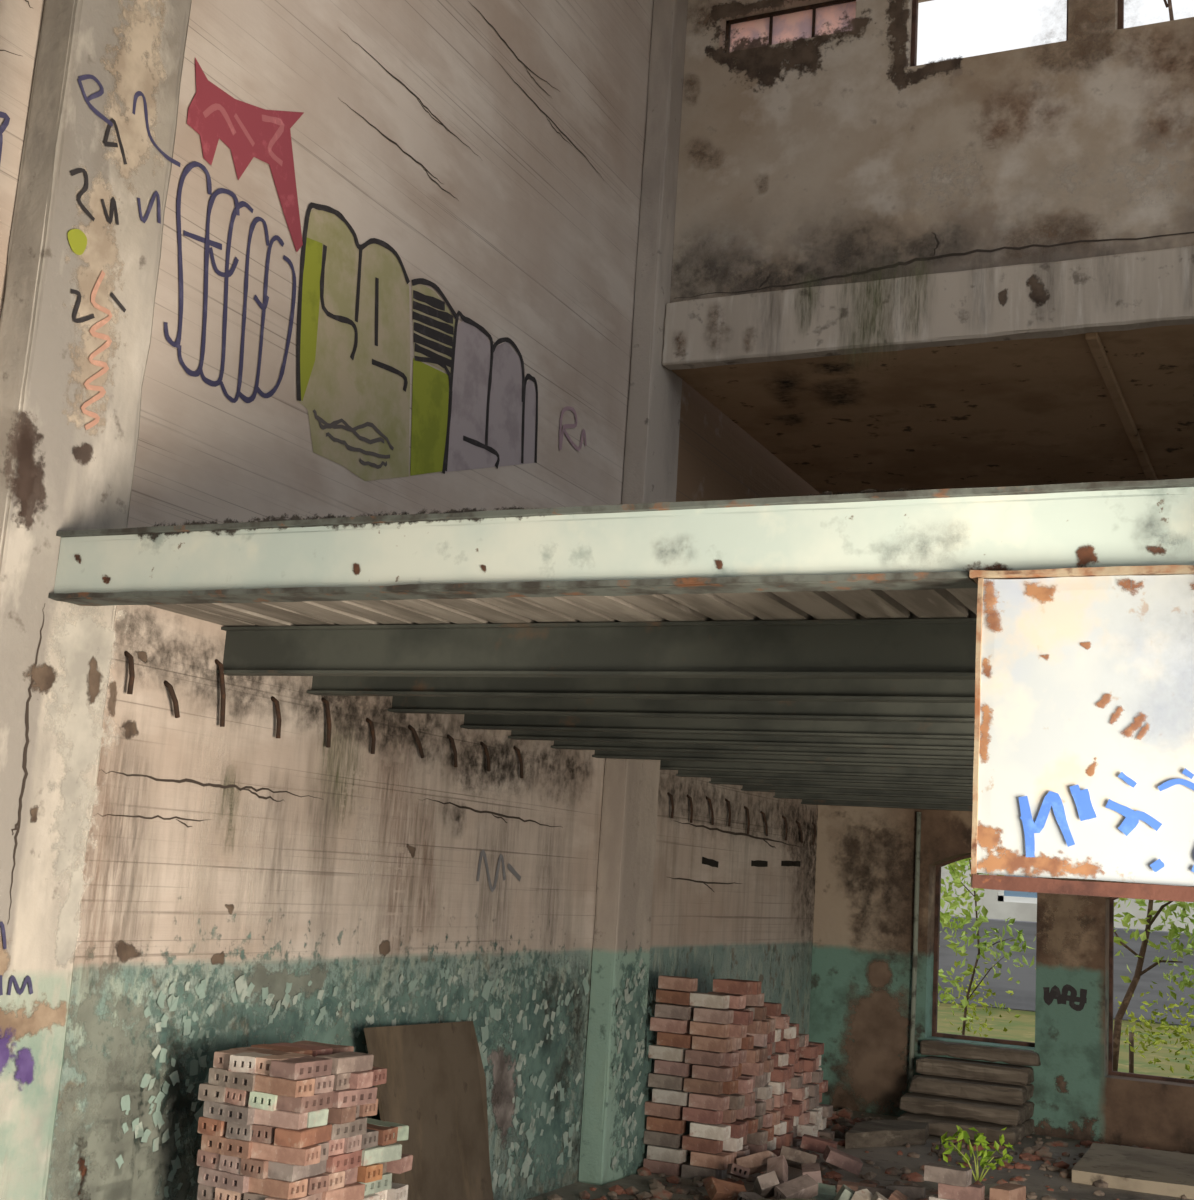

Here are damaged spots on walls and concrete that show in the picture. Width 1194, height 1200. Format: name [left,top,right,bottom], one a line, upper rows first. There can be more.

peeling [65,0,166,435]
crack [679,232,1194,298]
corrosion [1076,545,1099,568]
corrosion [1147,546,1167,555]
corrosion [966,563,1011,632]
corrosion [1025,583,1056,603]
corrosion [1119,579,1144,595]
corrosion [982,658,991,677]
corrosion [979,705,994,763]
corrosion [1096,694,1149,740]
corrosion [977,821,1104,879]
peeling [0,604,590,1200]